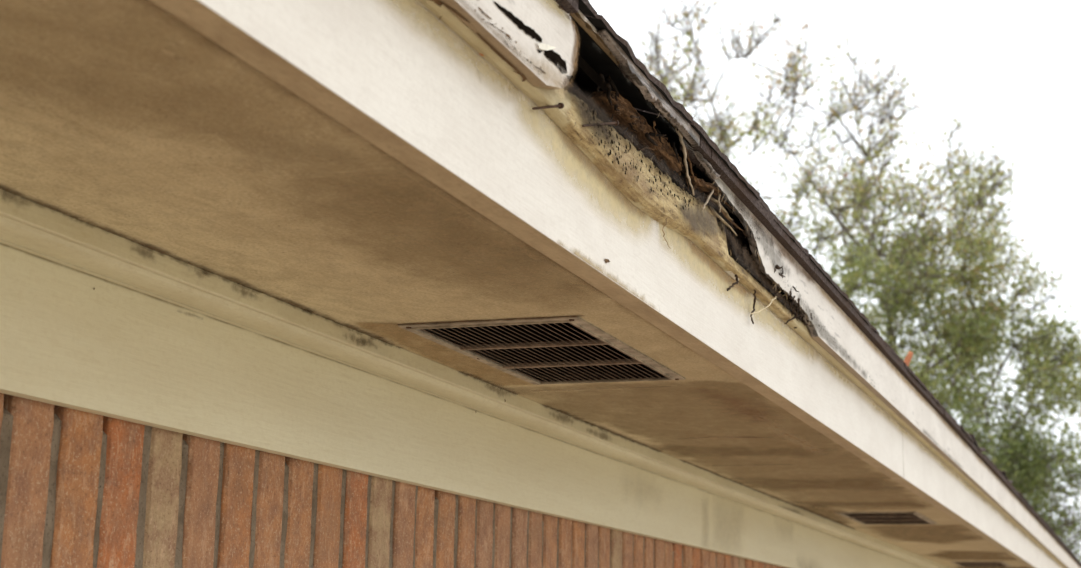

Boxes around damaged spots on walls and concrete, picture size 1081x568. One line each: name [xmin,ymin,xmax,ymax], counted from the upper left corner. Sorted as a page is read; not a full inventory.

leakage [520,20,846,356]
peeling [693,151,721,180]